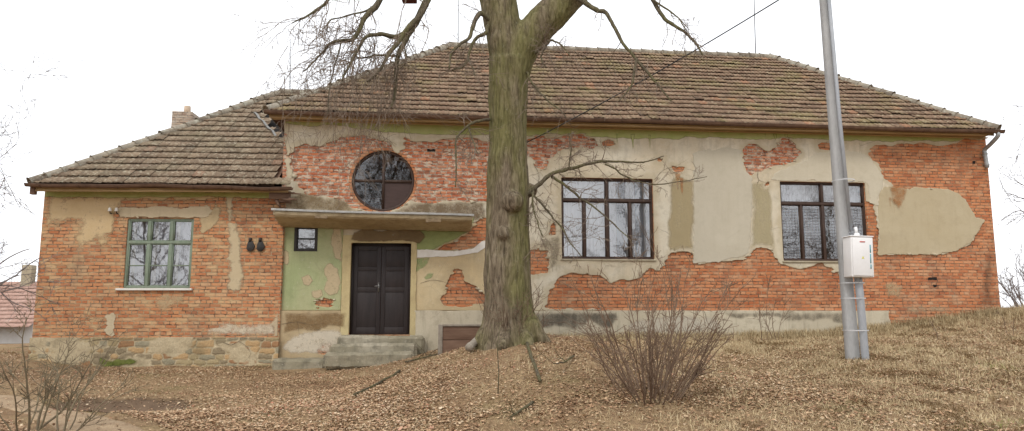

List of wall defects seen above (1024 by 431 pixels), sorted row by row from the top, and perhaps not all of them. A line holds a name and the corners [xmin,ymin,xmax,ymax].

flaking render [282,133,489,211]
flaking render [527,133,615,171]
flaking render [742,138,801,186]
flaking render [438,217,486,251]
flaking render [853,138,1000,325]
peeling [302,263,341,311]
flaking render [440,269,485,307]
flaking render [530,248,842,311]